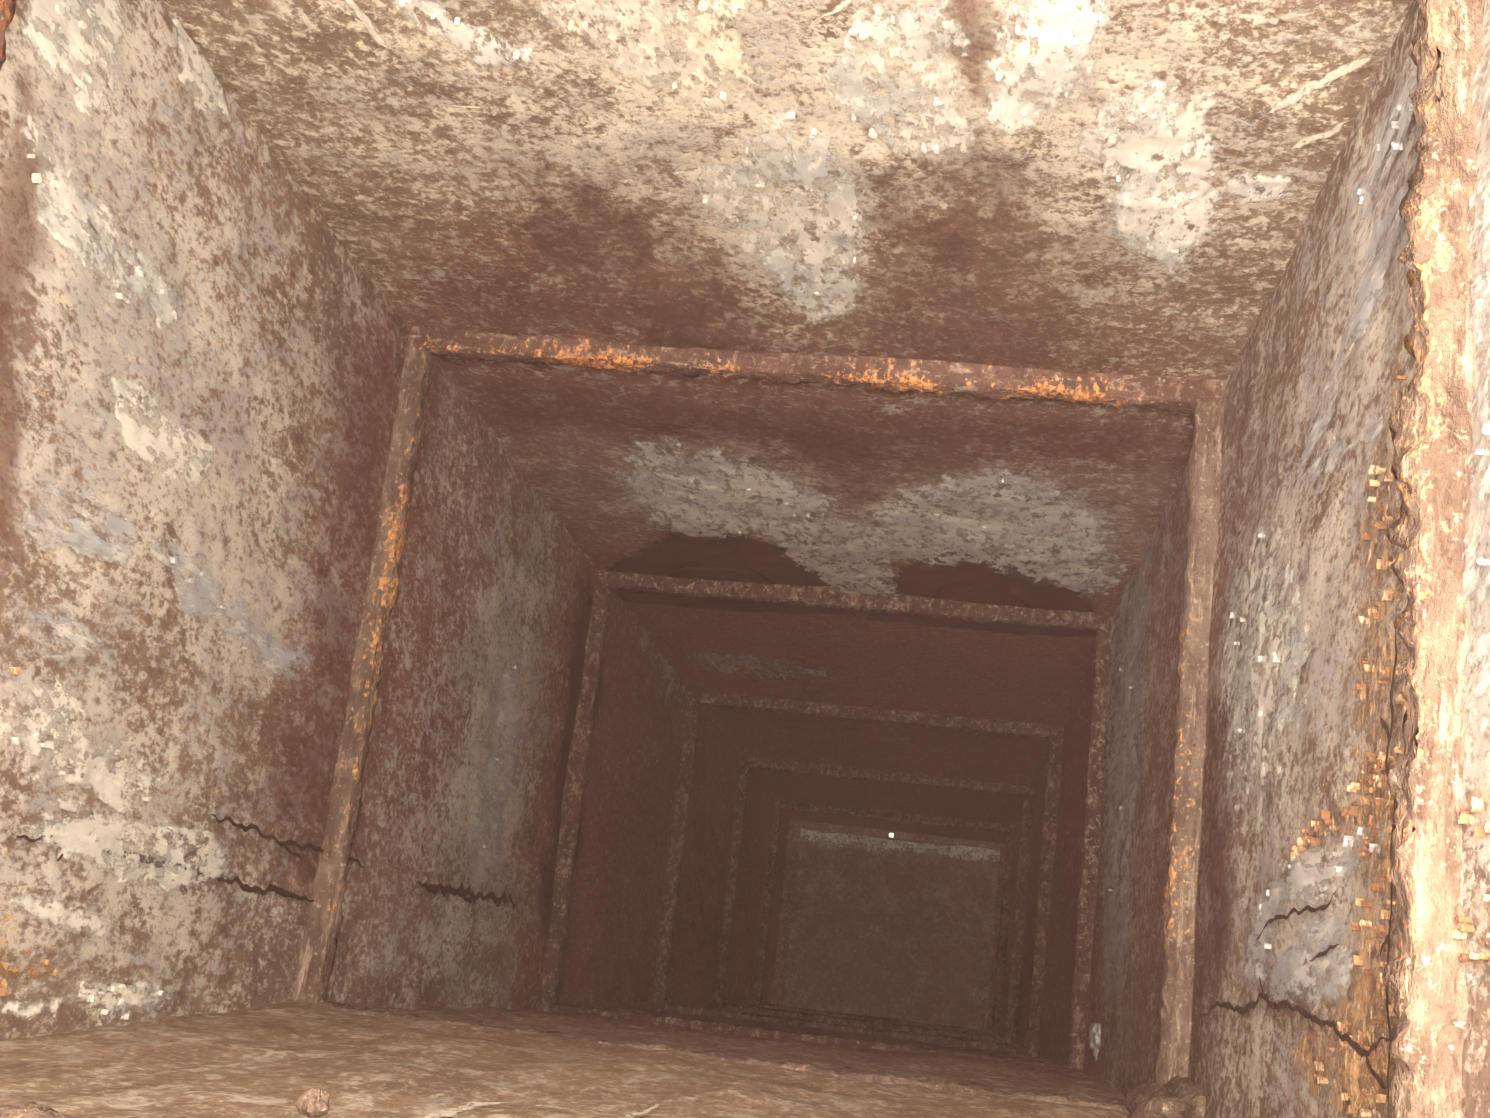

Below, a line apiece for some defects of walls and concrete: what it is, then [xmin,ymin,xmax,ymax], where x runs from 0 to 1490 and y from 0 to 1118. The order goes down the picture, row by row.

damp [345,0,387,47]
corrosion [0,84,39,348]
corrosion [0,384,18,528]
crack [17,835,64,861]
crack [91,812,366,902]
crack [415,881,521,909]
crack [1202,621,1397,1118]